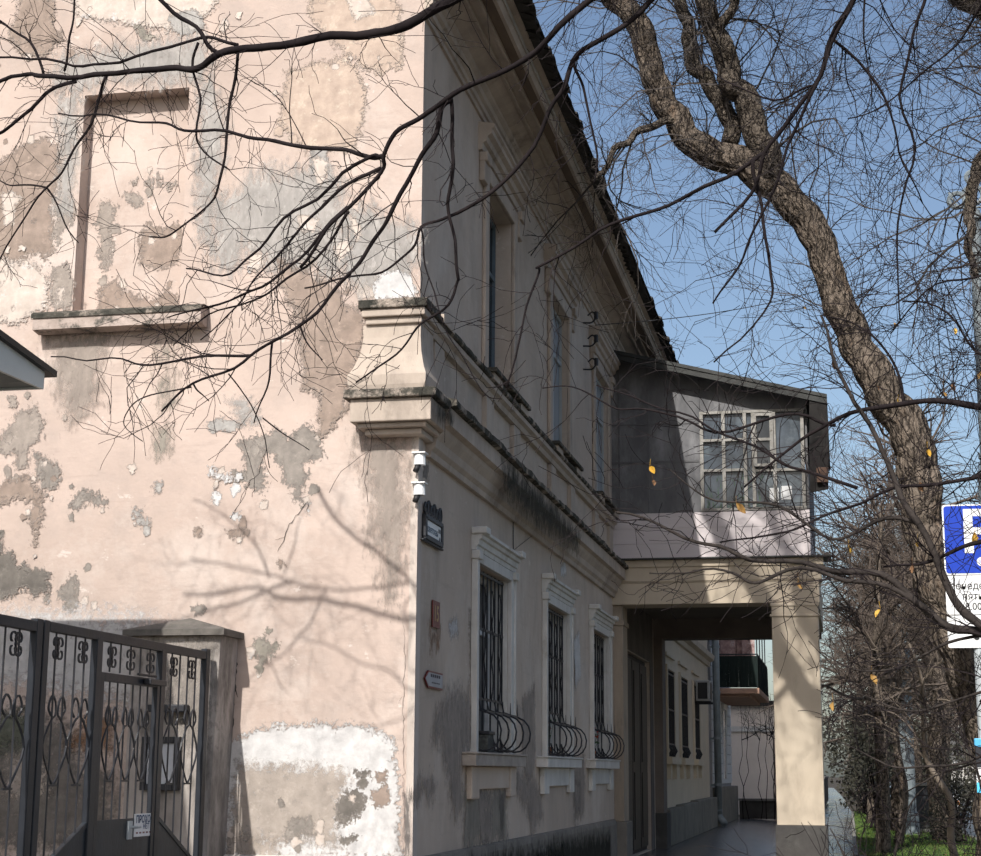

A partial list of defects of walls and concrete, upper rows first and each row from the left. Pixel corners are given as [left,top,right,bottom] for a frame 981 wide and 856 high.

flaking render [4,0,76,61]
flaking render [71,0,242,43]
flaking render [273,0,406,173]
flaking render [0,135,77,326]
flaking render [206,256,380,516]
flaking render [0,391,109,615]
flaking render [224,512,250,544]
water stain [353,428,413,601]
flaking render [246,626,282,678]
flaking render [282,767,392,854]
water stain [402,776,436,856]
water stain [433,686,542,847]